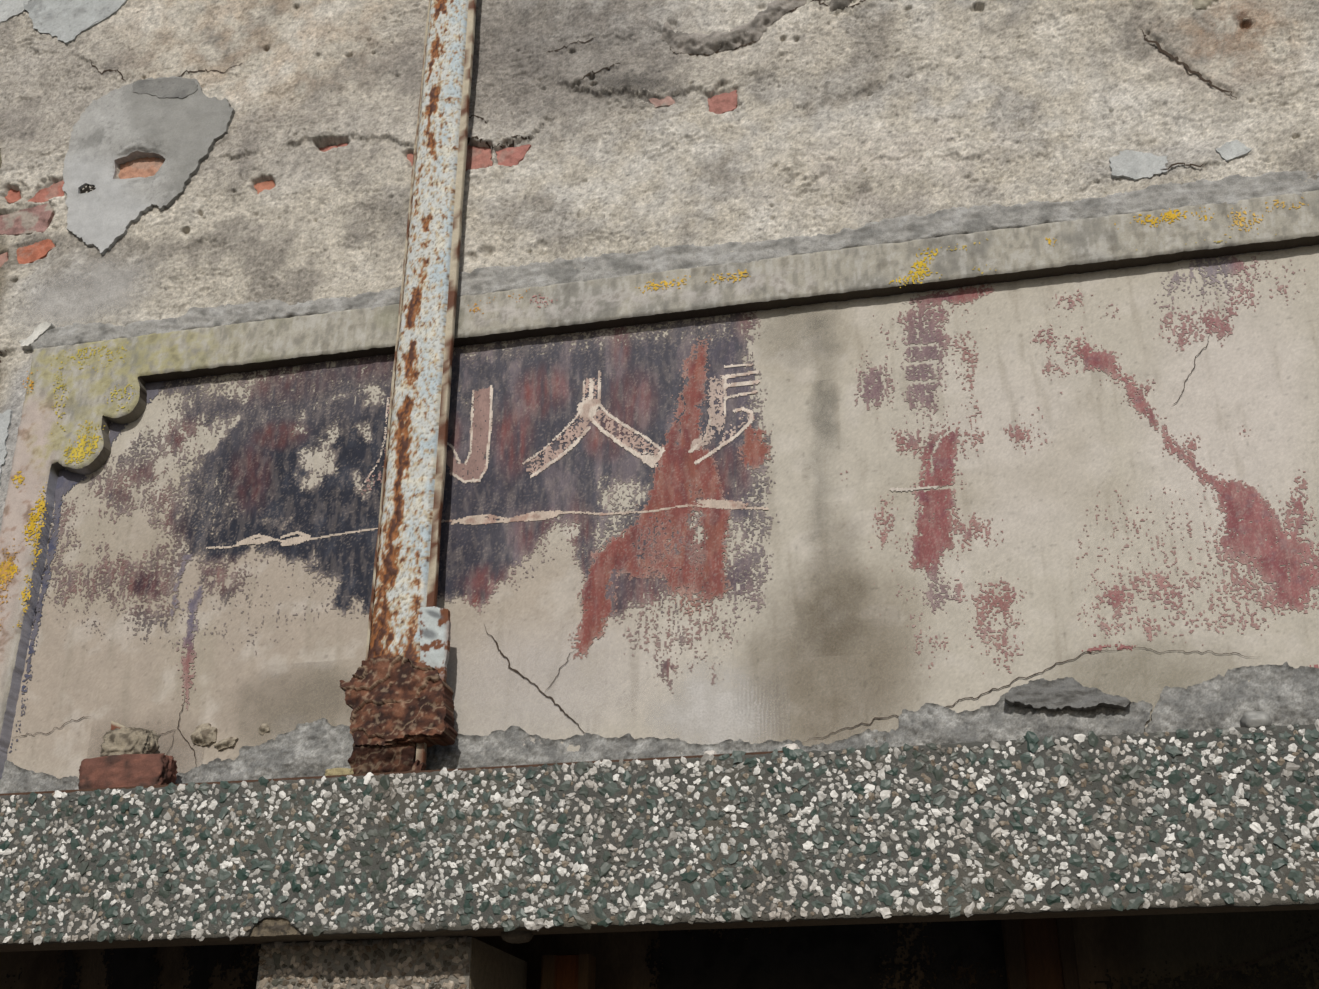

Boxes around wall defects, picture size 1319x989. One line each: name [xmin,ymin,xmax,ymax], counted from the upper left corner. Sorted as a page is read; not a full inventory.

crack [790,0,865,12]
crack [548,37,622,80]
crack [670,41,756,56]
crack [1140,29,1237,98]
spalling [0,76,236,268]
flaking render [254,180,276,194]
flaking render [465,144,531,172]
peeling [1114,197,1309,351]
peeling [0,239,1319,989]
crack [485,627,584,733]
crack [936,645,1260,709]
crack [804,715,899,742]